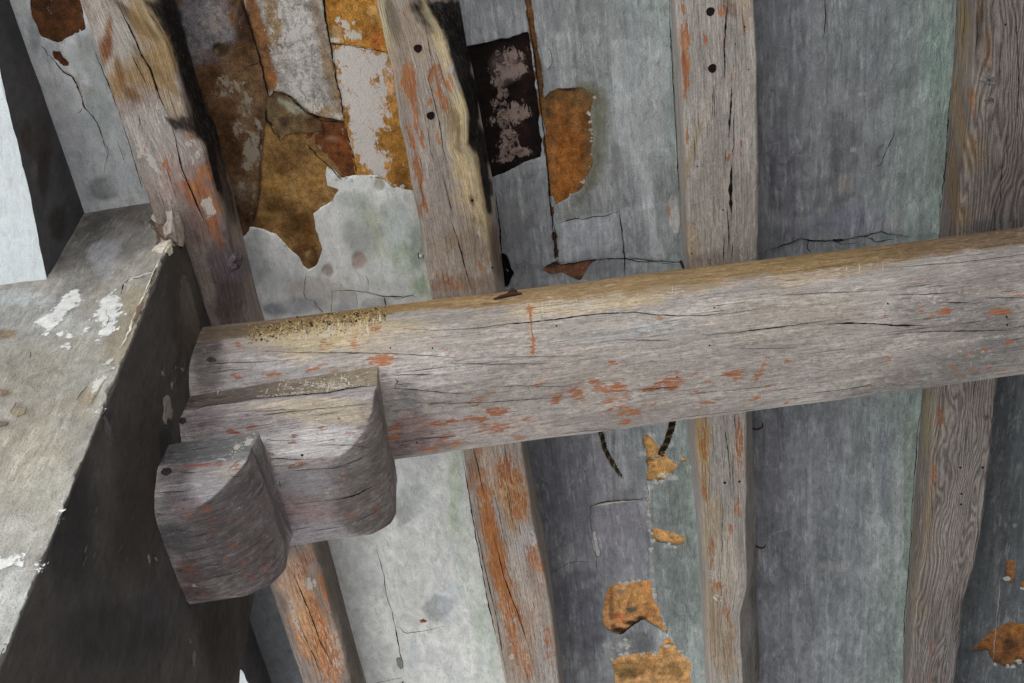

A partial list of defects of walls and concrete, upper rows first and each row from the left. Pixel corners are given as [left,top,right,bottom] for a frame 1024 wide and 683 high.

crack [41,41,145,195]
flaking render [174,0,413,269]
flaking render [537,87,597,204]
spalling [33,210,185,352]
crack [550,207,677,272]
crack [761,219,906,254]
flaking render [643,434,687,484]
flaking render [650,528,685,549]
flaking render [602,579,691,683]
flaking render [972,622,1024,668]